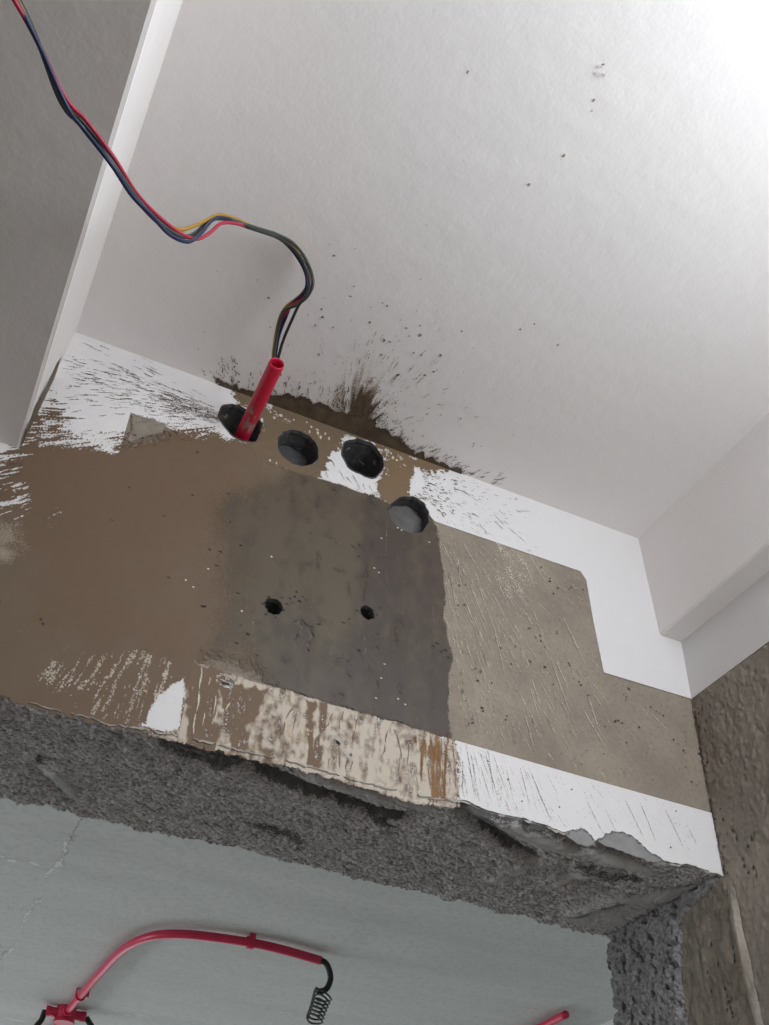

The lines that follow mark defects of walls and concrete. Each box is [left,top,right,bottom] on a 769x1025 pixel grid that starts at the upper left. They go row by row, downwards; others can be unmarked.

spalling [29,702,397,790]
spalling [242,821,305,852]
spalling [566,828,683,867]
spalling [573,862,643,884]